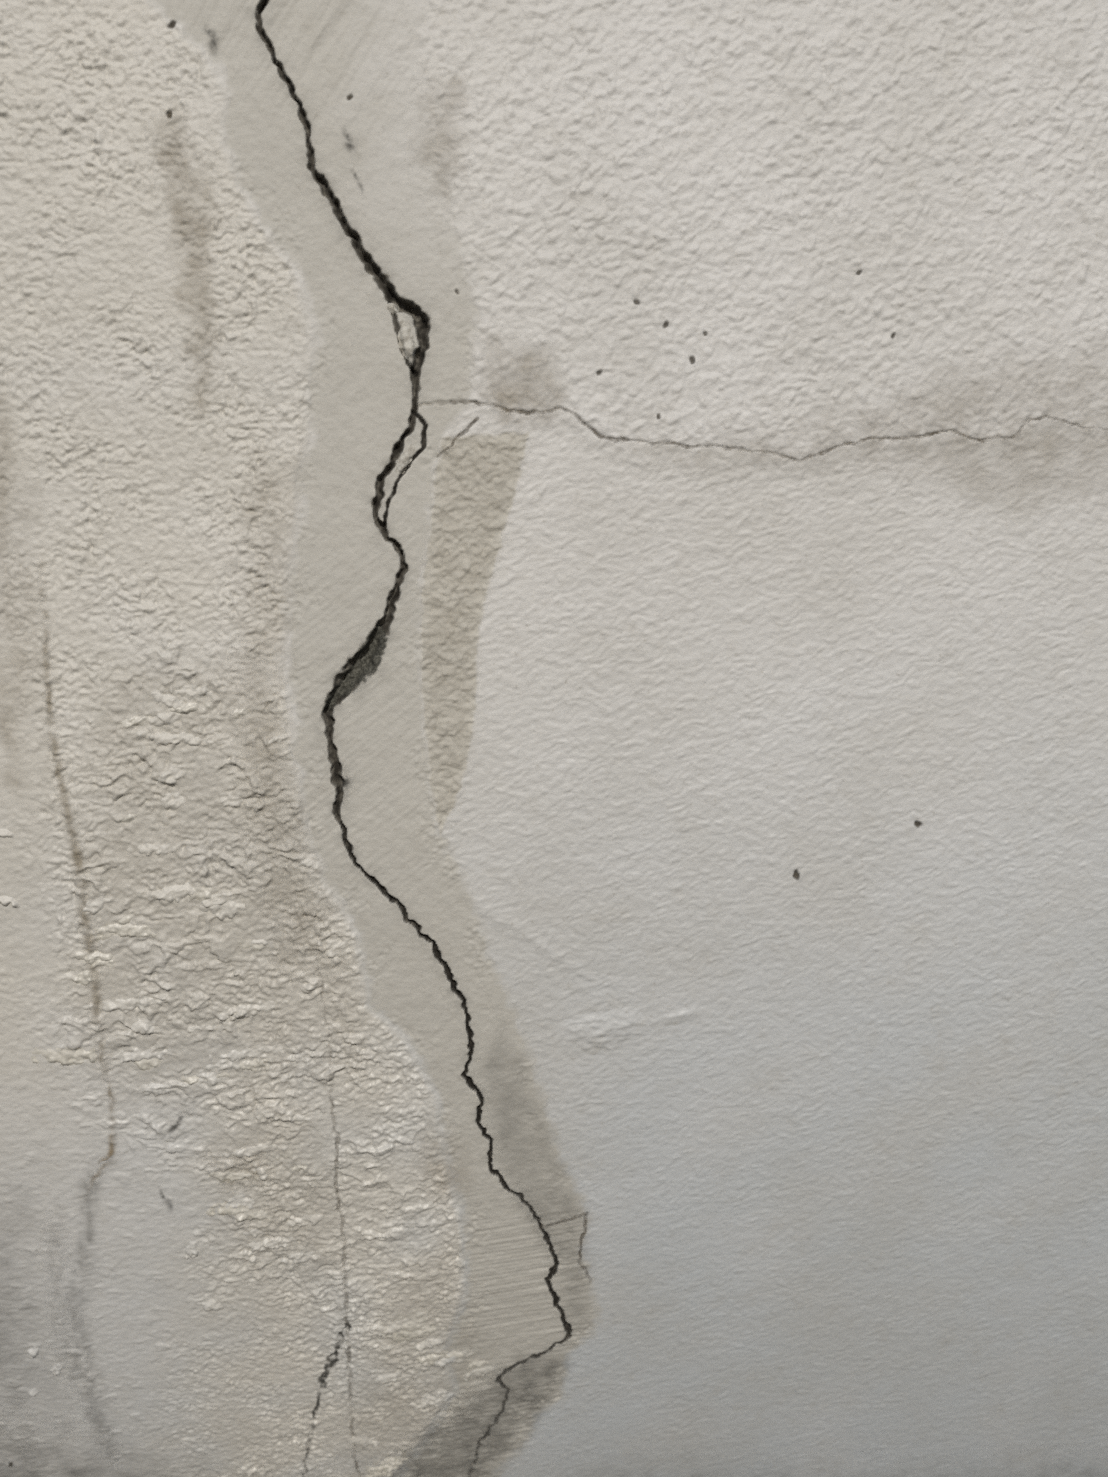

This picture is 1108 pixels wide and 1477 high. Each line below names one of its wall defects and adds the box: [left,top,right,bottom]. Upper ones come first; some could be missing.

crack [256,0,587,1475]